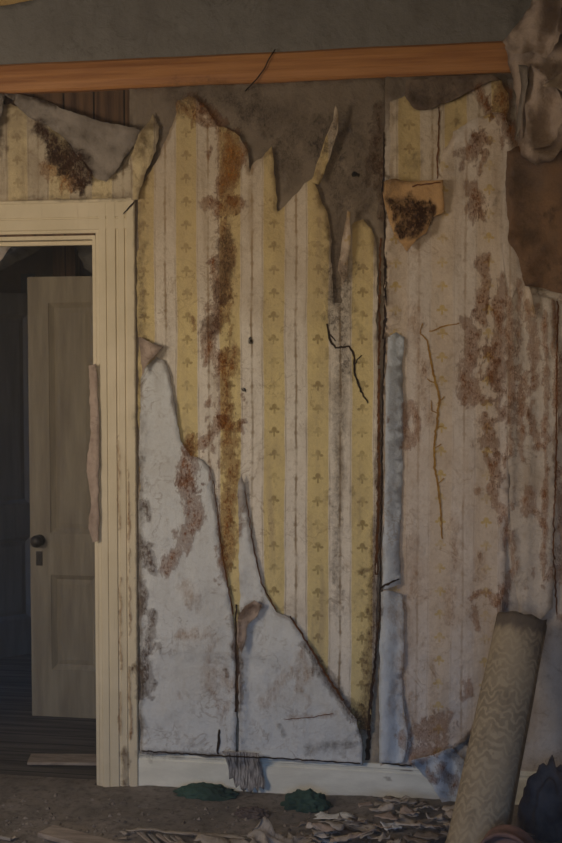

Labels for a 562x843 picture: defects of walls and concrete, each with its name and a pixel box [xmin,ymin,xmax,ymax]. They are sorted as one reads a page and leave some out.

leakage [32,119,93,196]
leakage [367,104,436,240]
leakage [174,131,245,578]
crack [141,132,412,767]
leakage [458,255,557,450]